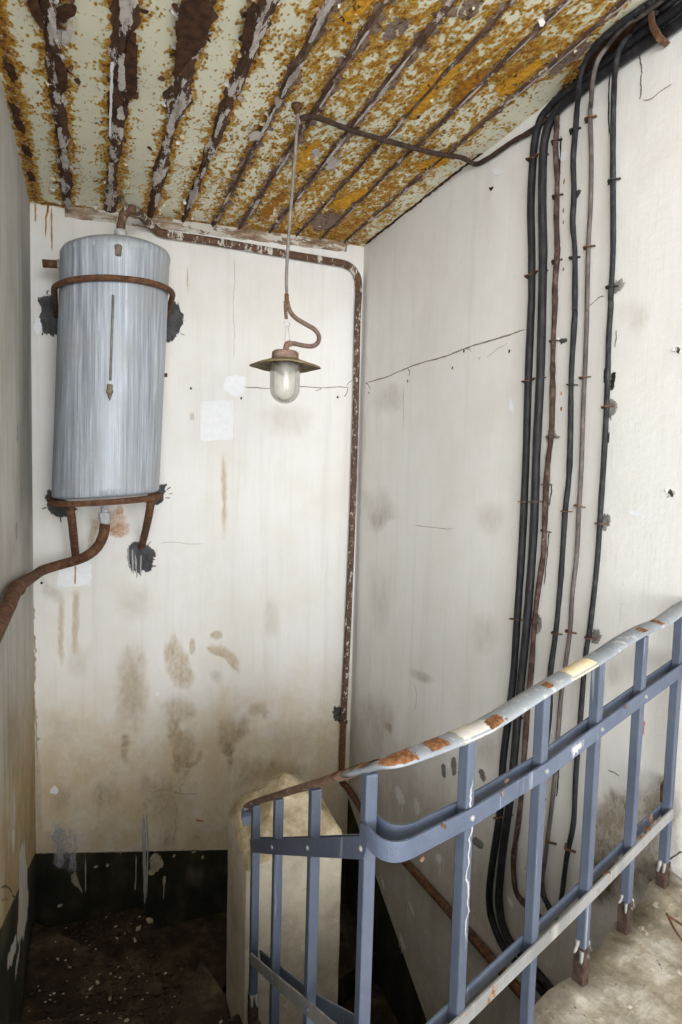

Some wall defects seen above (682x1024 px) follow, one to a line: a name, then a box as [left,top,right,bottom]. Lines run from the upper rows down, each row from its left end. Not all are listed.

peeling [37,0,81,107]
peeling [95,53,141,120]
peeling [232,34,270,72]
peeling [248,103,287,141]
corrosion [0,0,674,248]
peeling [308,148,342,171]
crack [247,330,523,396]
peeling [7,828,29,981]